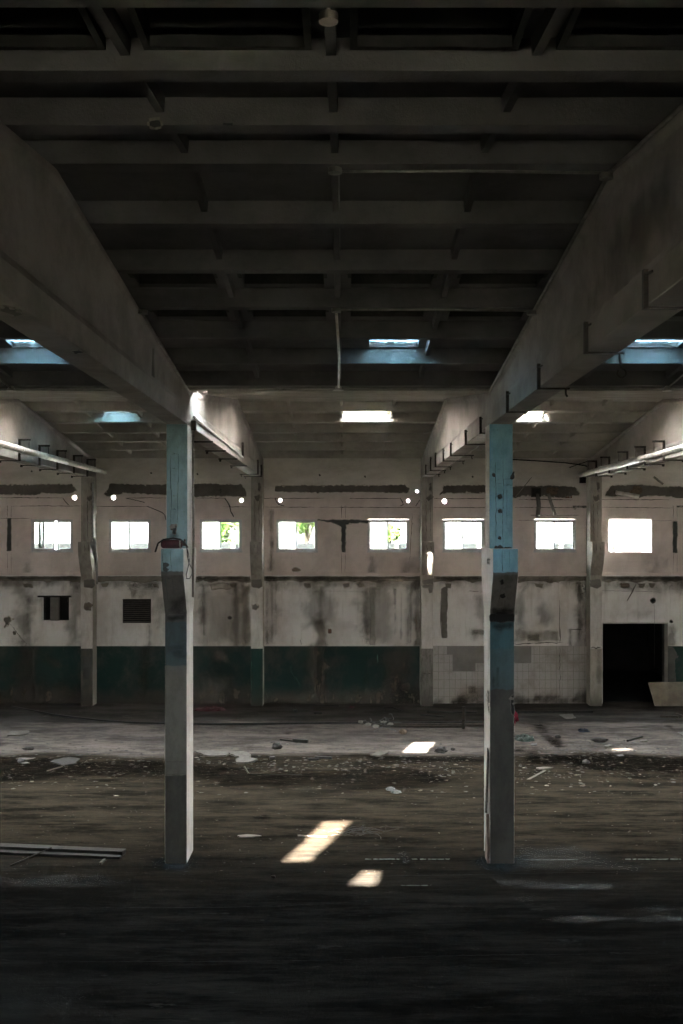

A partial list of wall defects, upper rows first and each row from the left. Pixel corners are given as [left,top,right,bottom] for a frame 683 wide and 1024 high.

flaking render [0,470,166,502]
flaking render [194,473,262,503]
flaking render [497,471,683,513]
leakage [360,580,420,645]
flaking render [489,613,515,623]